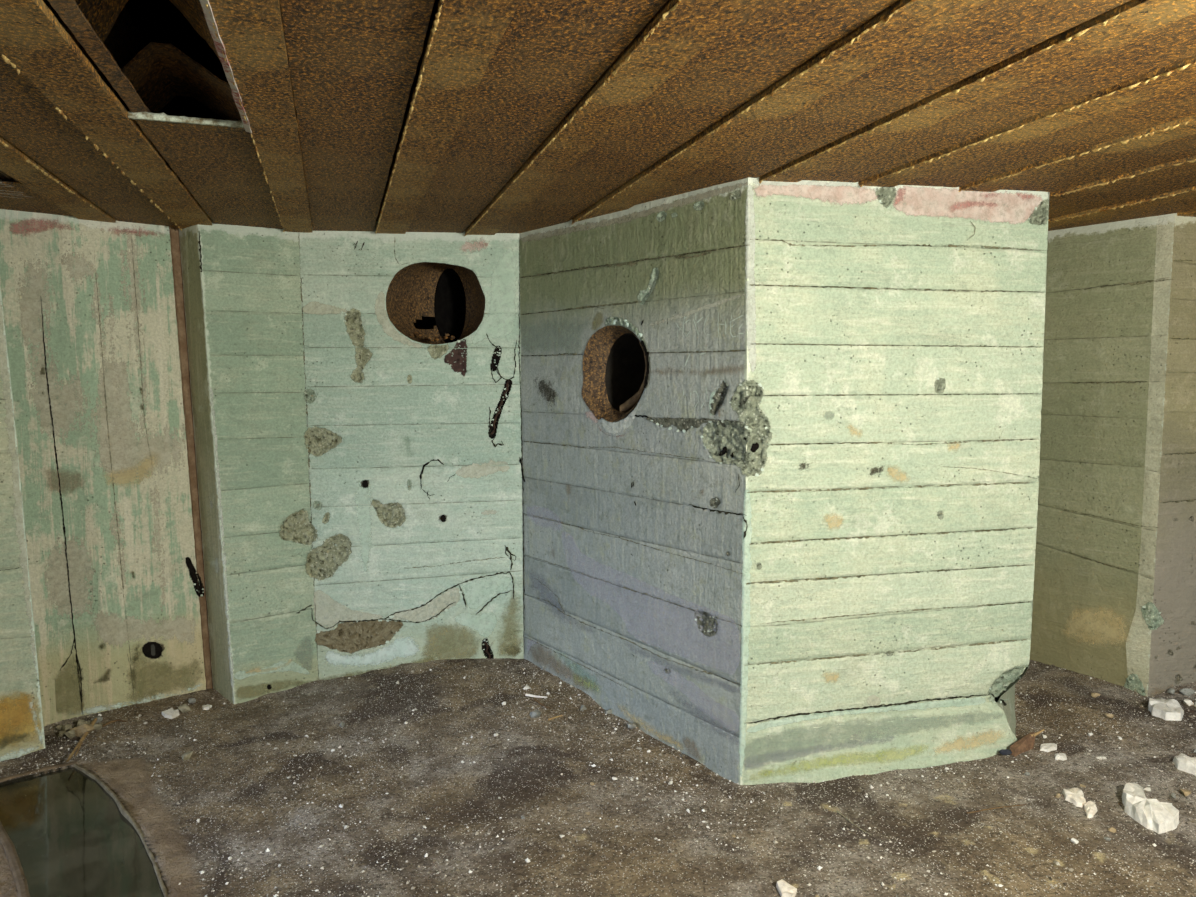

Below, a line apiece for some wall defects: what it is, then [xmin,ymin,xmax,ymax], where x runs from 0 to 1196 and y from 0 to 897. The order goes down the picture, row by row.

crack [1078,260,1192,290]
crack [41,299,83,713]
crack [292,245,313,557]
spalling [304,426,343,457]
spalling [372,499,406,528]
spalling [343,291,449,383]
crack [297,221,1037,691]
peeling [593,180,1049,776]
crack [1073,378,1141,386]
crack [1064,499,1193,528]
spalling [279,501,403,654]
spalling [482,639,494,659]